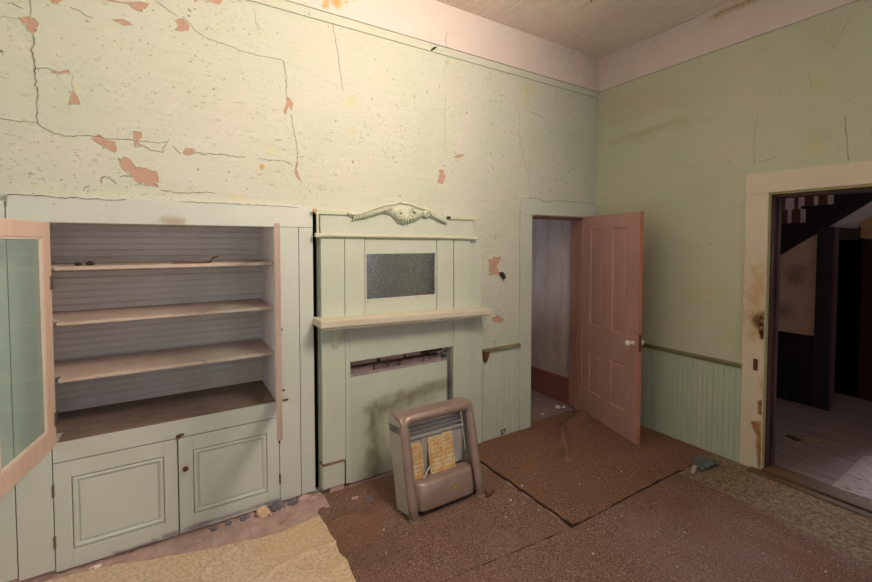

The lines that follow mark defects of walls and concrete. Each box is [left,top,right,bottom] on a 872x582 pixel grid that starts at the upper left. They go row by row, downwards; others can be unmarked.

peeling [18,16,41,34]
crack [0,1,298,167]
peeling [68,90,82,105]
peeling [283,96,294,115]
peeling [133,130,143,148]
peeling [91,134,160,188]
crack [6,175,130,206]
crack [161,190,296,208]
peeling [488,256,501,276]